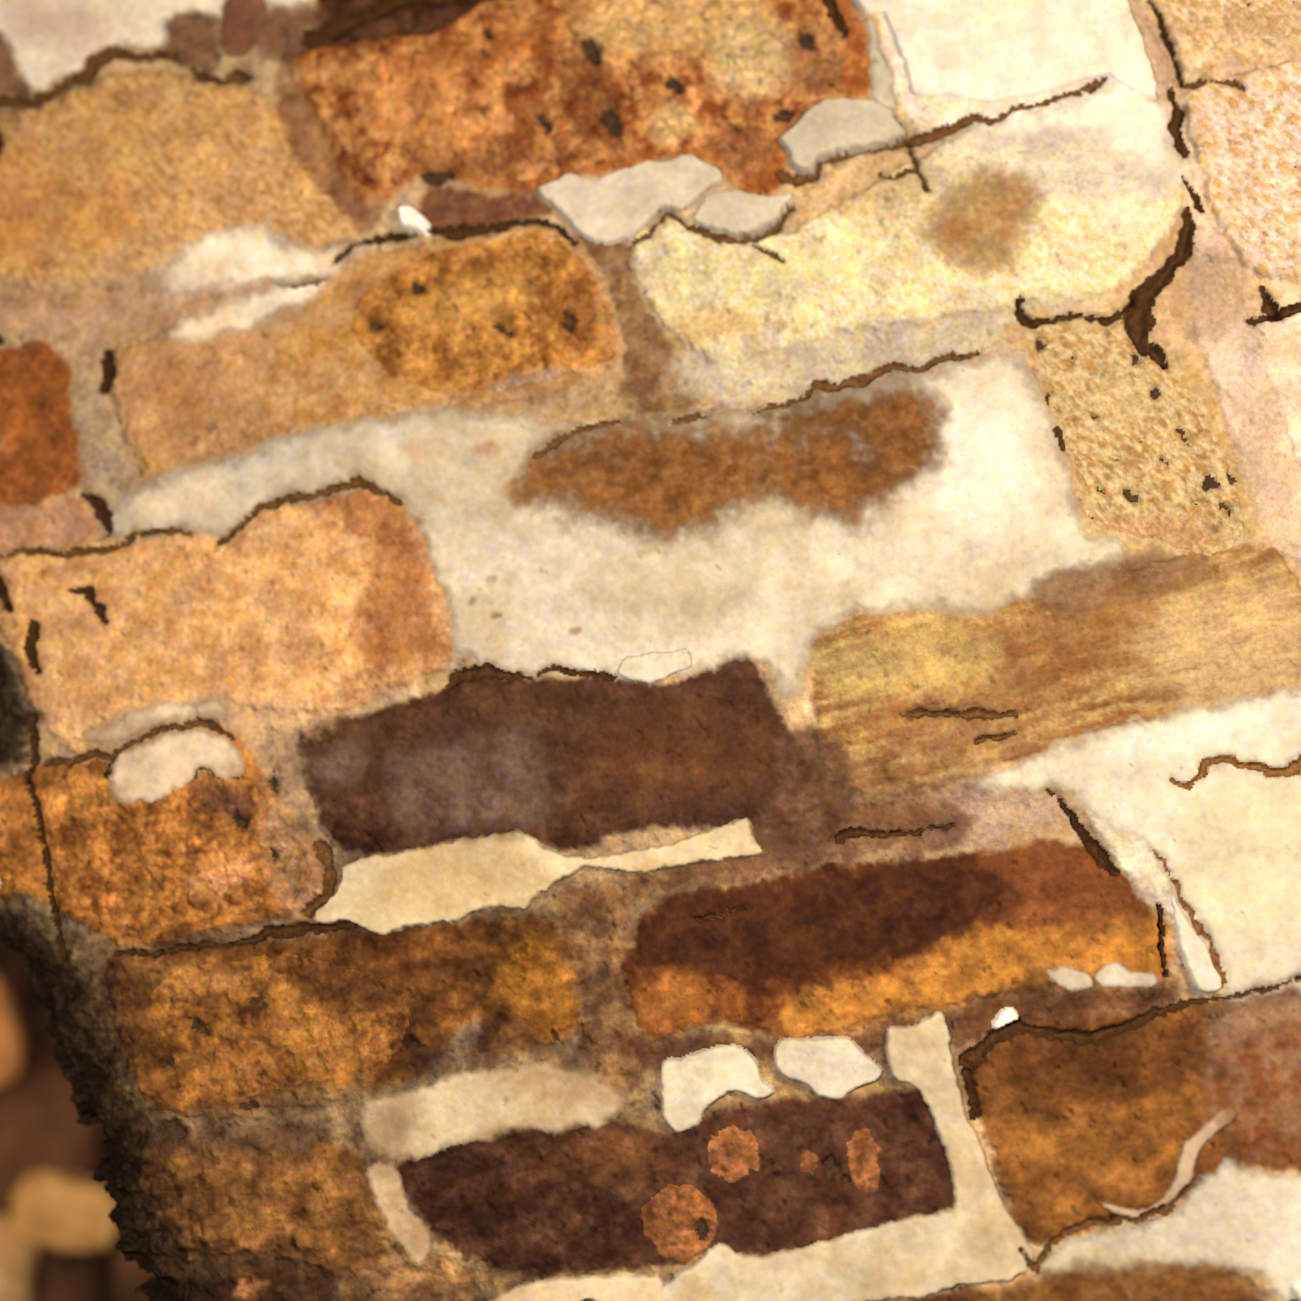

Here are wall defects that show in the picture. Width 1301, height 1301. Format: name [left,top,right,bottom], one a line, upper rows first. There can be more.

spalling [300,0,1194,395]
crack [628,77,1107,263]
crack [1015,0,1245,370]
crack [1246,285,1301,326]
water stain [516,389,947,541]
crack [0,475,402,674]
peeling [981,689,1301,1000]
crack [1170,754,1301,790]
peeling [991,1007,1019,1030]
crack [959,849,1301,1120]
flaking render [362,1062,622,1262]
peeling [489,1011,1301,1301]